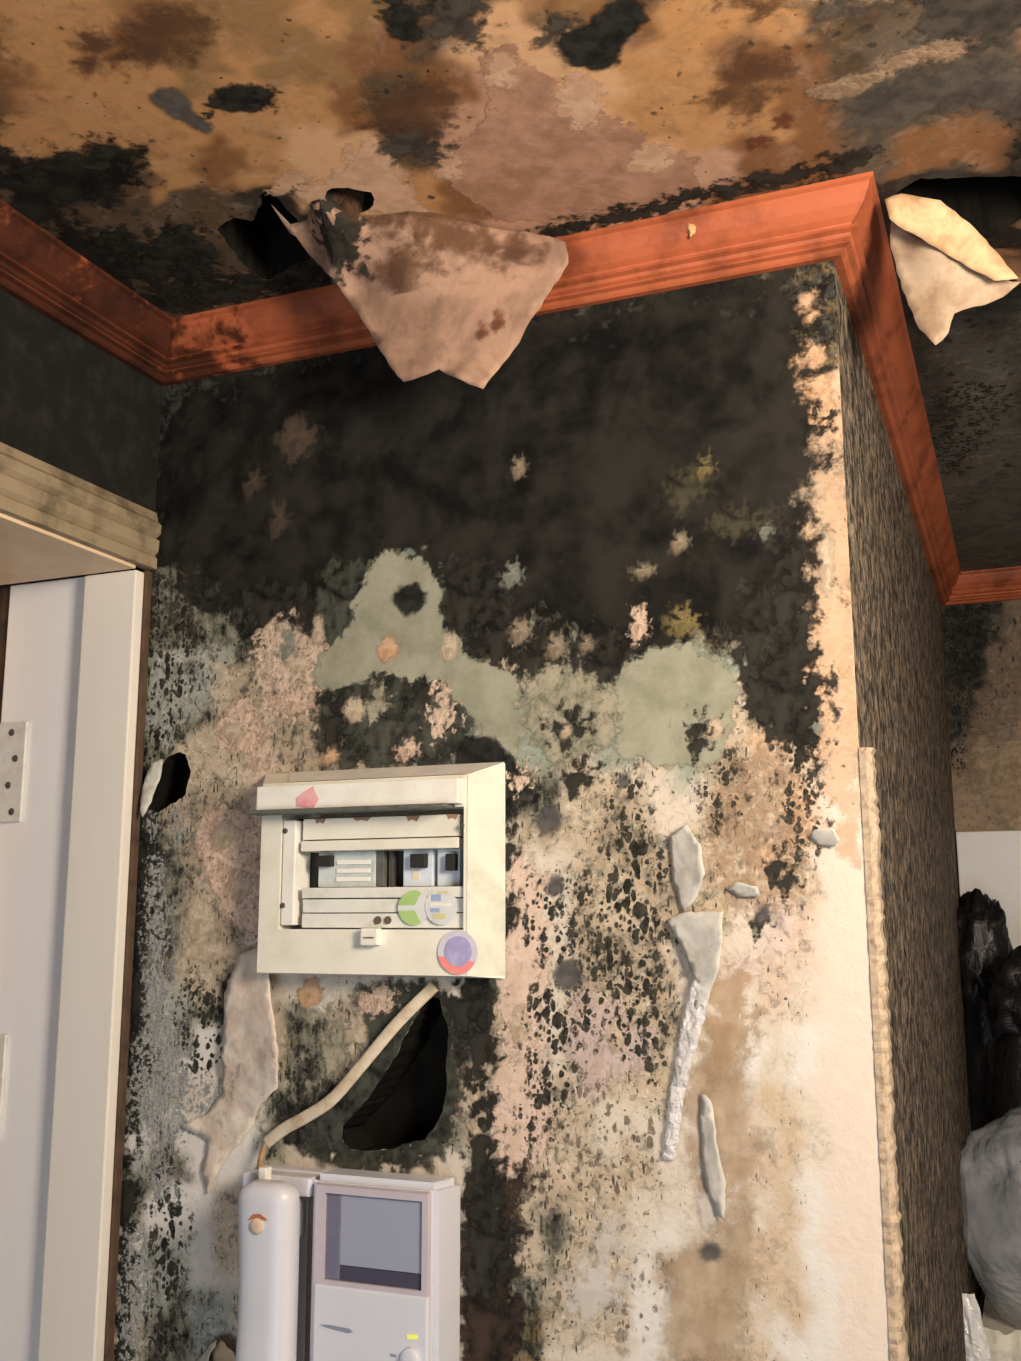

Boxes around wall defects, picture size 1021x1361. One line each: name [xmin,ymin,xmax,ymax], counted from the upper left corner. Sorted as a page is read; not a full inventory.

leakage [150,83,283,133]
peeling [265,137,428,217]
leakage [362,81,459,167]
leakage [375,0,501,51]
leakage [518,0,1021,238]
leakage [0,132,842,862]
leakage [113,807,224,1361]
peeling [115,752,262,1361]
spalling [352,977,401,1020]
spalling [342,997,452,1151]
leakage [279,671,680,1361]
leakage [604,967,762,1361]